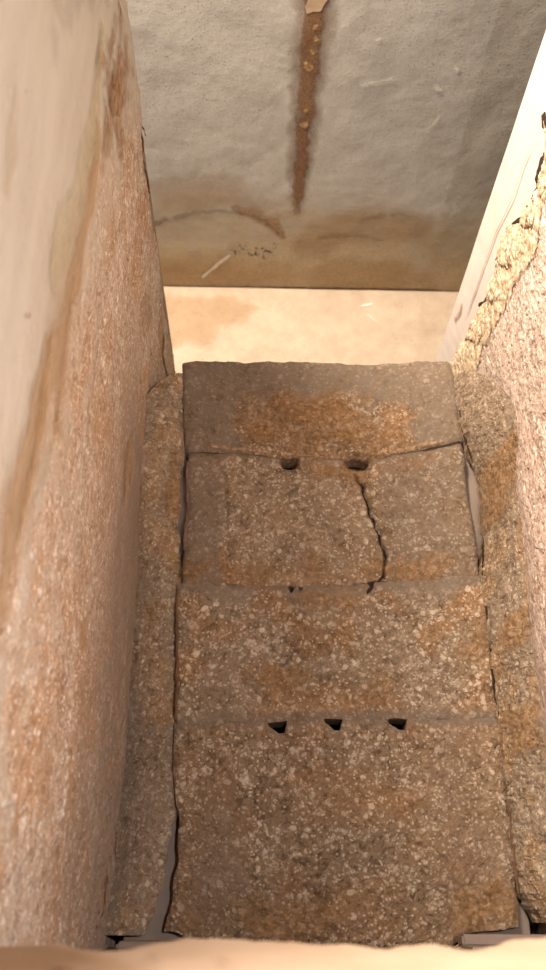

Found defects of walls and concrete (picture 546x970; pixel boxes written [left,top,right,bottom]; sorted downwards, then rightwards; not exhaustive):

corrosion [292,0,328,208]
leakage [159,208,468,292]
spalling [450,112,546,376]
crack [354,477,386,595]